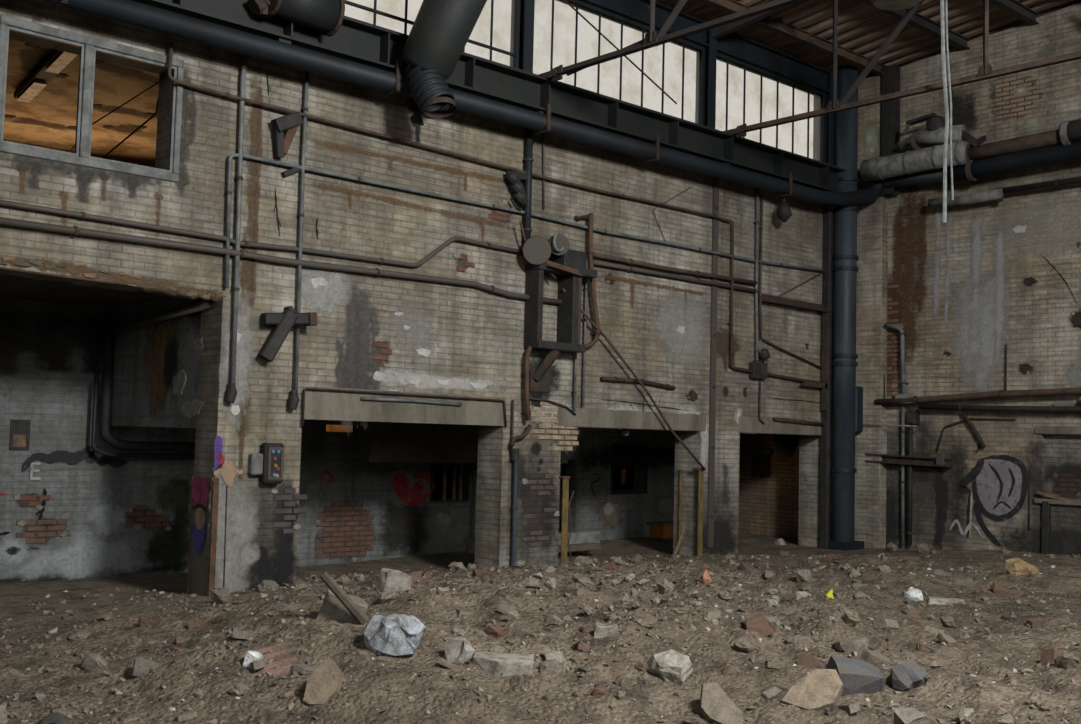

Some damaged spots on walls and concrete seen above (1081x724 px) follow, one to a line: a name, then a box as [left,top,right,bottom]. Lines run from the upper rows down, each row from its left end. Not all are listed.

damp [1,154,160,203]
rust [240,82,262,331]
spalling [0,256,254,428]
rust [237,344,251,479]
peeling [301,268,350,313]
peeling [369,336,508,392]
flaking render [525,395,579,453]
flaking render [887,284,905,396]
flaking render [13,493,70,544]
damp [0,479,190,584]